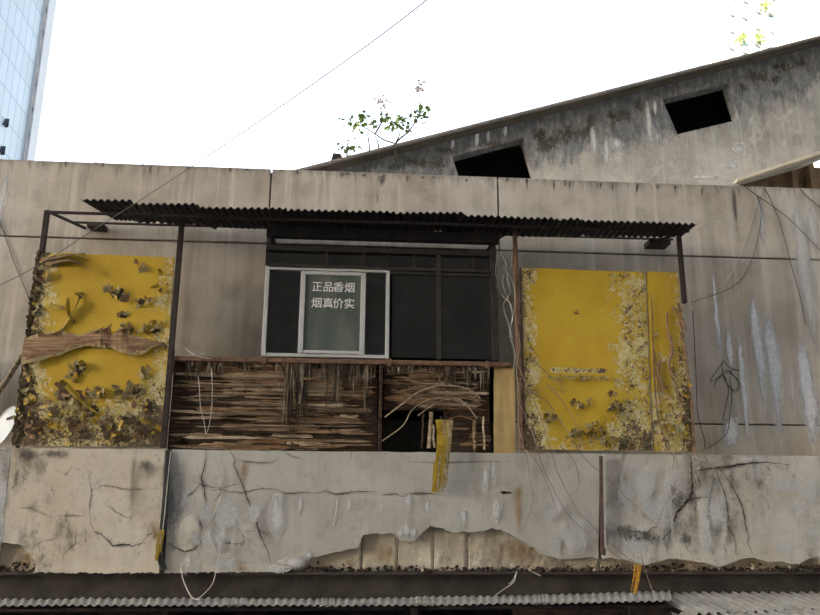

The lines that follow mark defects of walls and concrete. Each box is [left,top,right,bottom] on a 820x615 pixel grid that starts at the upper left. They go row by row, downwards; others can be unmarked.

damp [739,57,814,95]
damp [531,114,621,165]
damp [606,99,657,142]
peeling [102,259,168,345]
peeling [10,358,162,444]
peeling [543,412,558,426]
peeling [548,336,647,448]
peeling [655,364,692,449]
spalling [0,530,36,573]
peeling [179,488,263,576]
crack [31,449,441,563]
spalling [265,463,820,573]